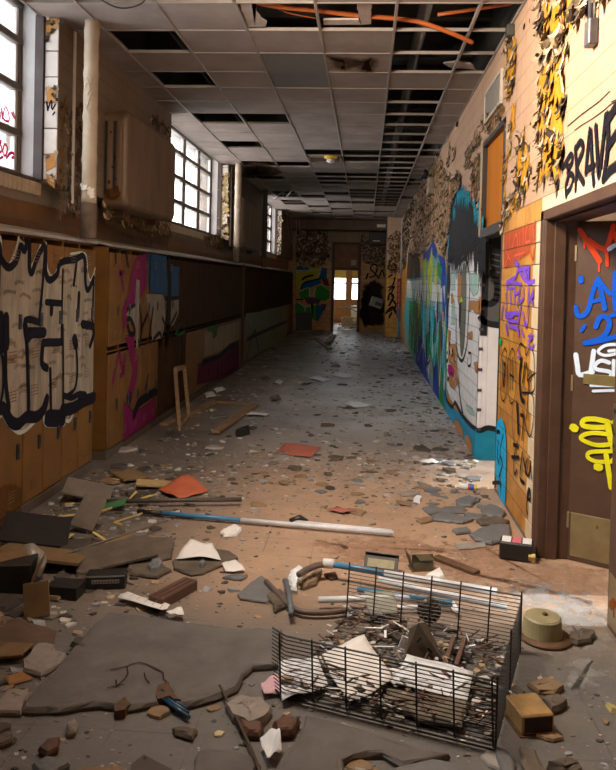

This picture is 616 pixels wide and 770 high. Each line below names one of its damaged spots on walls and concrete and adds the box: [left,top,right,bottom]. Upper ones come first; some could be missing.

spalling [240,4,267,27]
spalling [323,4,372,25]
peeling [43,17,63,42]
peeling [150,115,171,138]
peeling [361,0,602,277]
peeling [45,85,83,227]
crack [107,662,169,688]